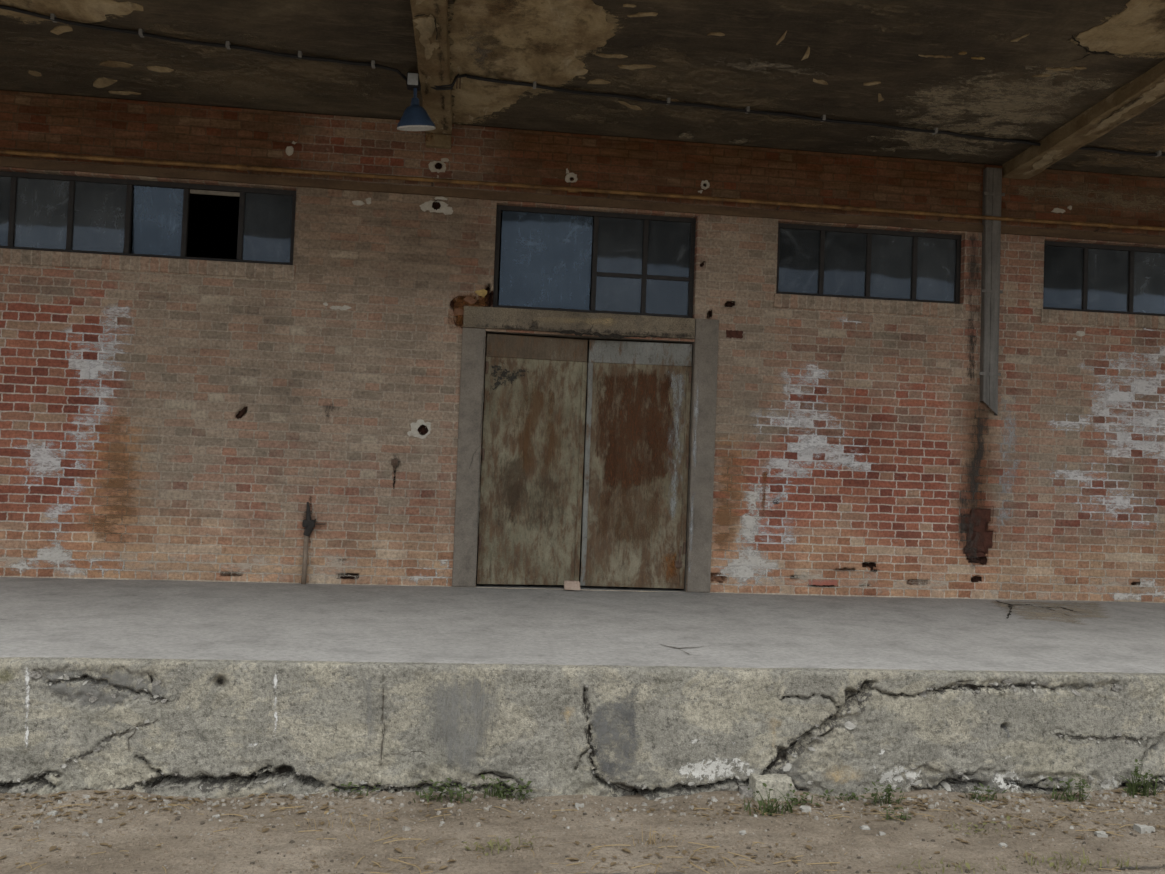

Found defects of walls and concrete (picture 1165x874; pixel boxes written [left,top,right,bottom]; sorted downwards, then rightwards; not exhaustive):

peeling [0,0,143,35]
peeling [93,60,141,95]
peeling [413,0,658,125]
peeling [1069,0,1165,59]
water stain [0,307,290,578]
corrosion [595,370,677,506]
water stain [715,364,876,588]
water stain [959,409,986,558]
water stain [1049,346,1165,525]
crack [0,673,526,795]
crack [575,679,1114,800]
crack [1042,728,1165,790]